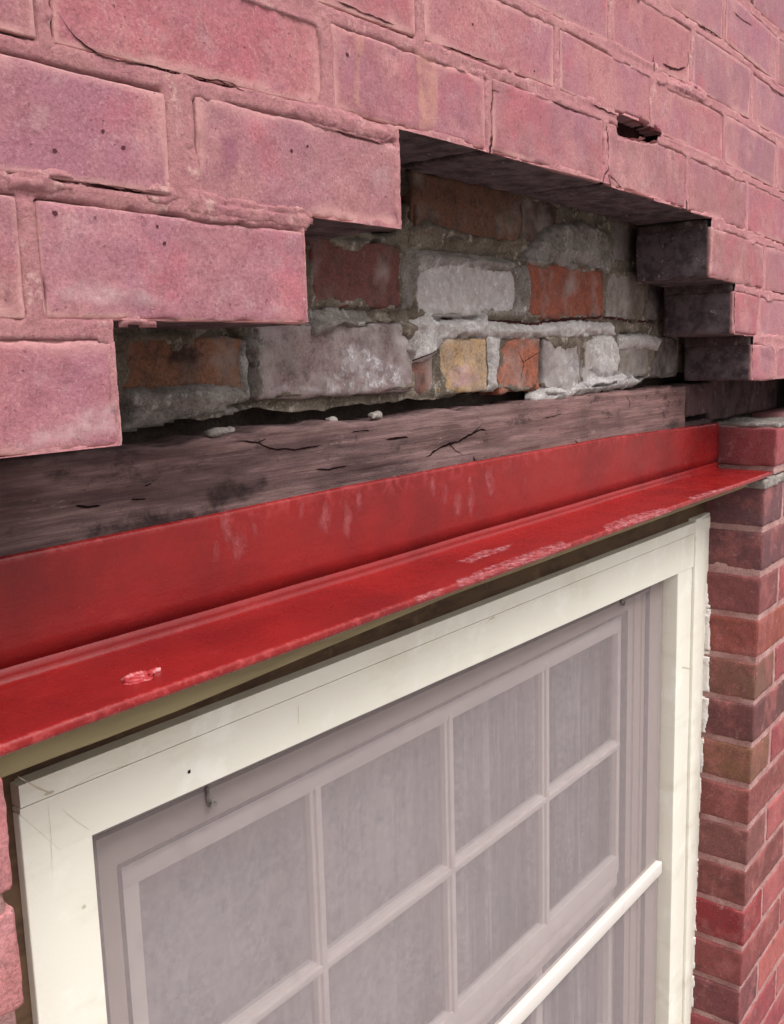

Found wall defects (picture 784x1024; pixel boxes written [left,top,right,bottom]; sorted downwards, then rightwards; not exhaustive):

crack [59,14,244,91]
peeling [617,122,647,143]
spalling [113,166,778,432]
crack [235,439,348,471]
crack [353,430,409,440]
crack [427,427,485,461]
crack [75,502,101,510]